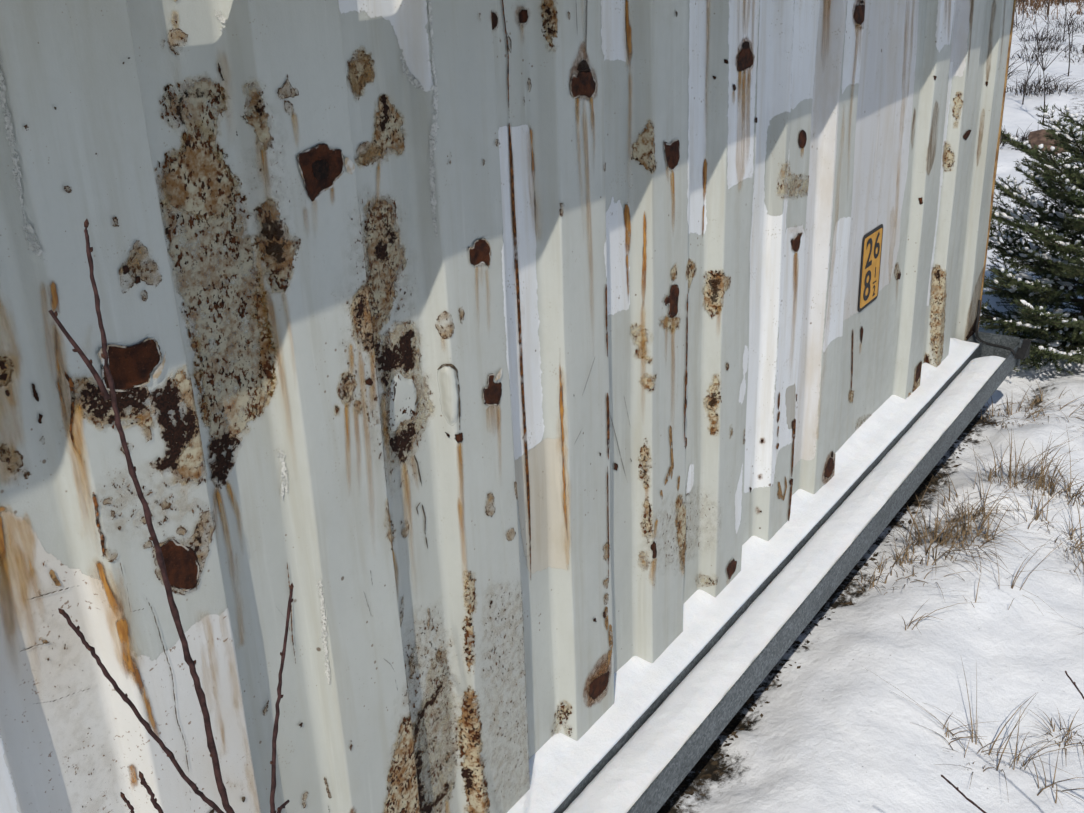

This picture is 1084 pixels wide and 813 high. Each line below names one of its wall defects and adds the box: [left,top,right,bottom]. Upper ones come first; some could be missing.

rust [297,95,405,201]
rust [0,356,14,396]
rust [50,282,59,312]
rust [55,63,301,595]
rust [335,196,433,488]
rust [0,443,31,479]
rust [0,506,31,574]
rust [28,557,62,586]
rust [384,571,530,813]
rust [584,607,613,707]